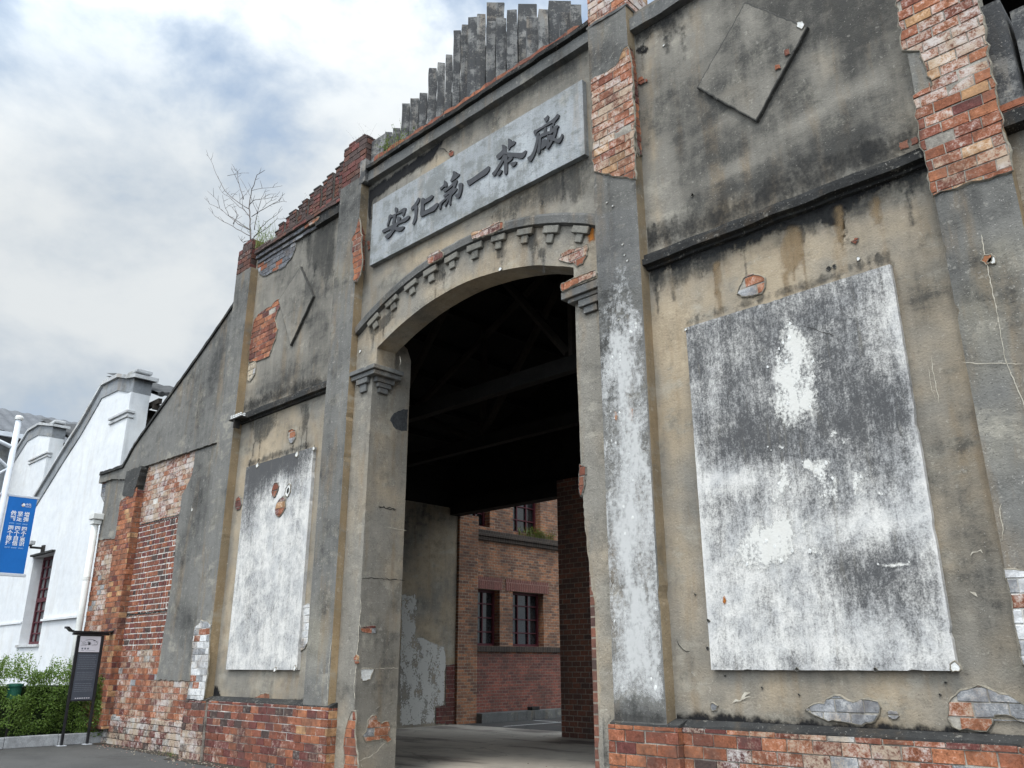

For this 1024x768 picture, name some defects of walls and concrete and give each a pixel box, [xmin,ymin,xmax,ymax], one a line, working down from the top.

spalling [590,46,648,180]
spalling [895,0,1014,198]
spalling [247,299,280,382]
spalling [558,244,597,293]
spalling [737,273,767,298]
damp [647,132,911,247]
damp [650,167,928,311]
crack [963,235,1024,404]
flaking render [78,450,212,755]
peeling [343,594,455,768]
spalling [805,694,899,727]
spalling [939,660,1024,733]